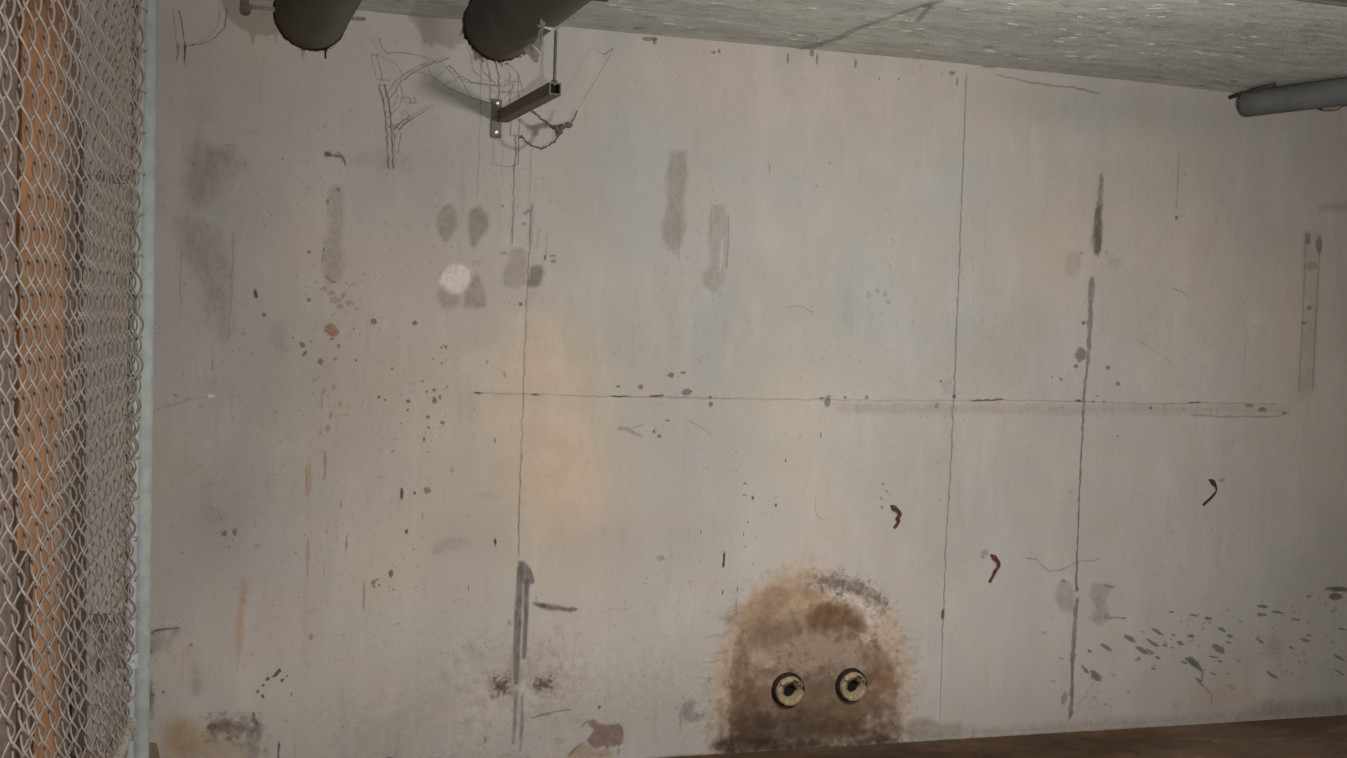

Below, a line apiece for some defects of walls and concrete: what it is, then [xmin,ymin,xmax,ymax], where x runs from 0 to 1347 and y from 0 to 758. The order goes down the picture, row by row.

damp [715,576,909,753]